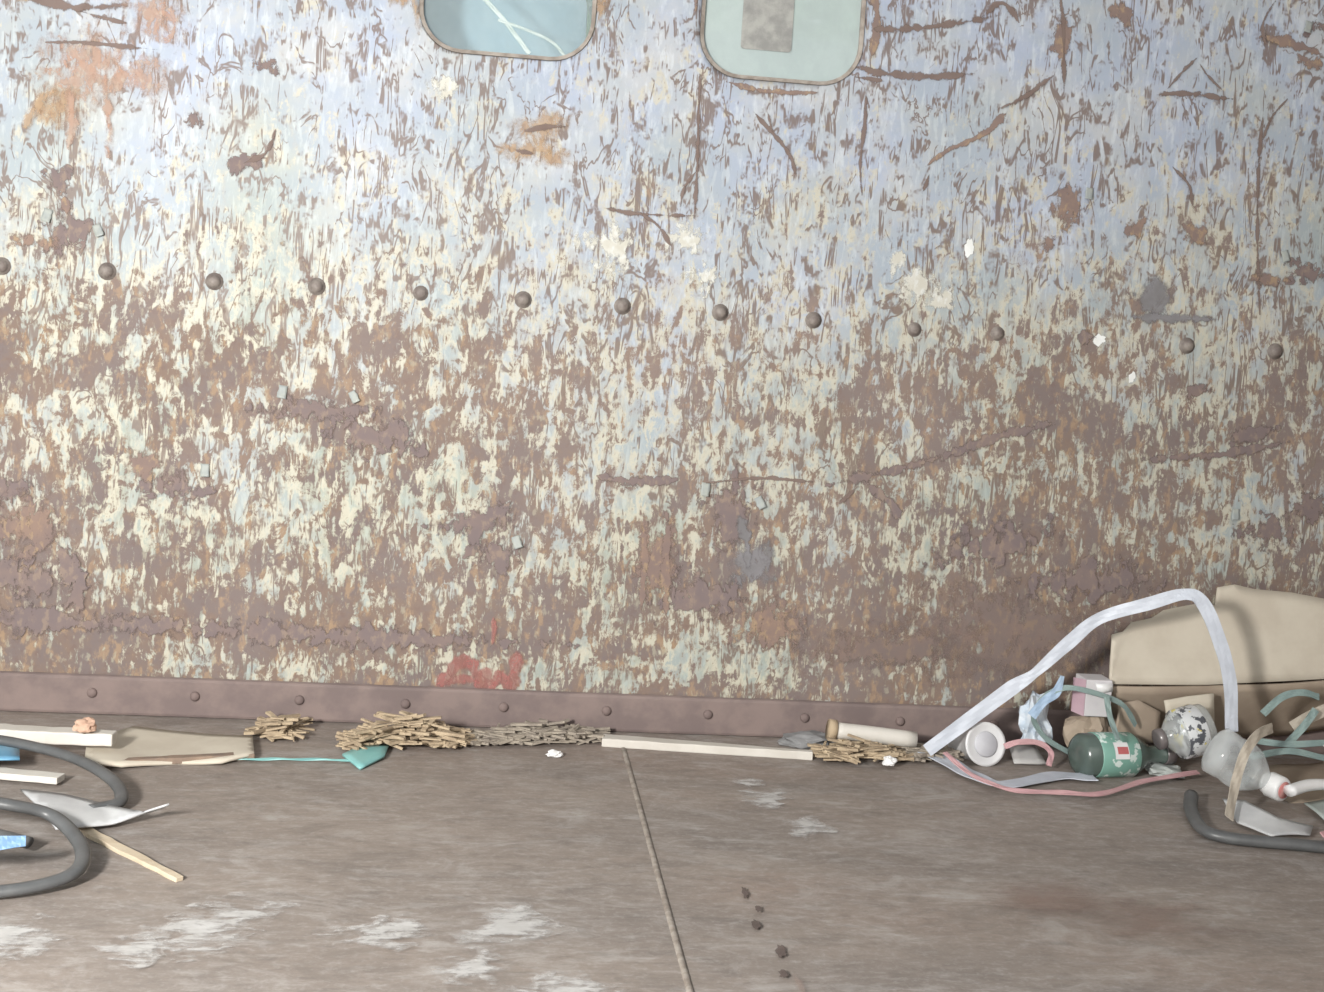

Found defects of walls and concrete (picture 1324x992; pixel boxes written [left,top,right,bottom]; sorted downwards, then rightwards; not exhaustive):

rust [24,24,166,158]
peeling [252,58,280,77]
rust [726,81,817,95]
rust [869,0,882,57]
peeling [923,0,1072,191]
peeling [1259,0,1324,71]
peeling [227,129,276,176]
rust [499,114,565,164]
peeling [10,164,104,259]
peeling [1043,183,1094,253]
rust [0,540,521,653]
rust [791,513,1181,683]